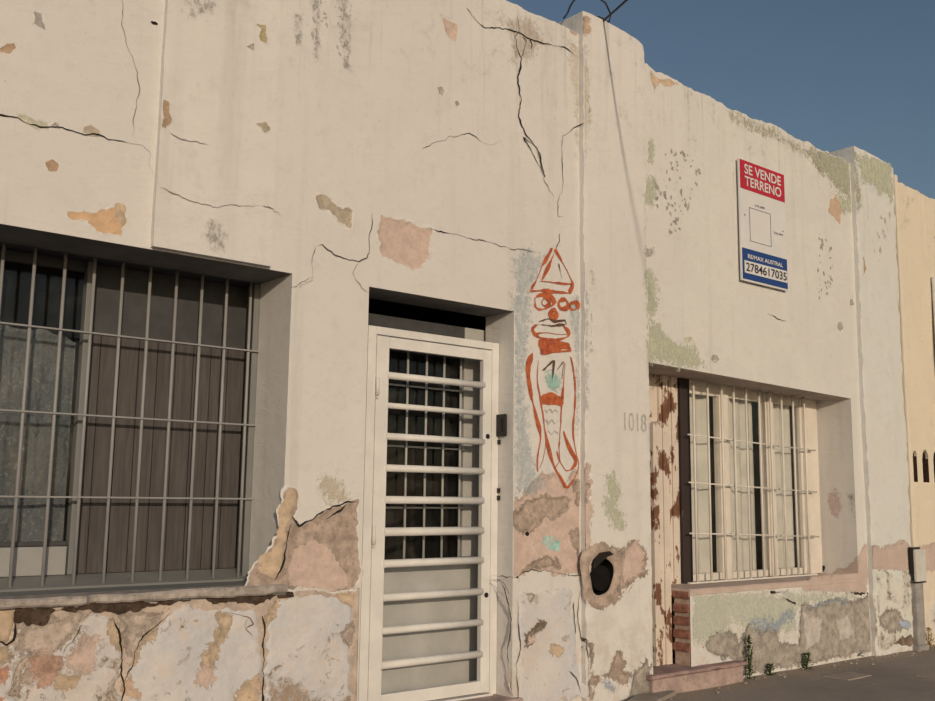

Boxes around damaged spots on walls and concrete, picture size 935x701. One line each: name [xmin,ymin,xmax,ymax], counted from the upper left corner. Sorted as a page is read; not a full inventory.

crack [0,2,276,212]
crack [433,8,585,253]
peeling [65,202,128,237]
crack [295,220,373,291]
spalling [314,192,355,232]
spalling [376,213,436,271]
spalling [0,598,191,700]
spalling [233,673,263,701]
spalling [194,485,364,688]
spalling [513,462,649,610]
spalling [702,539,935,677]